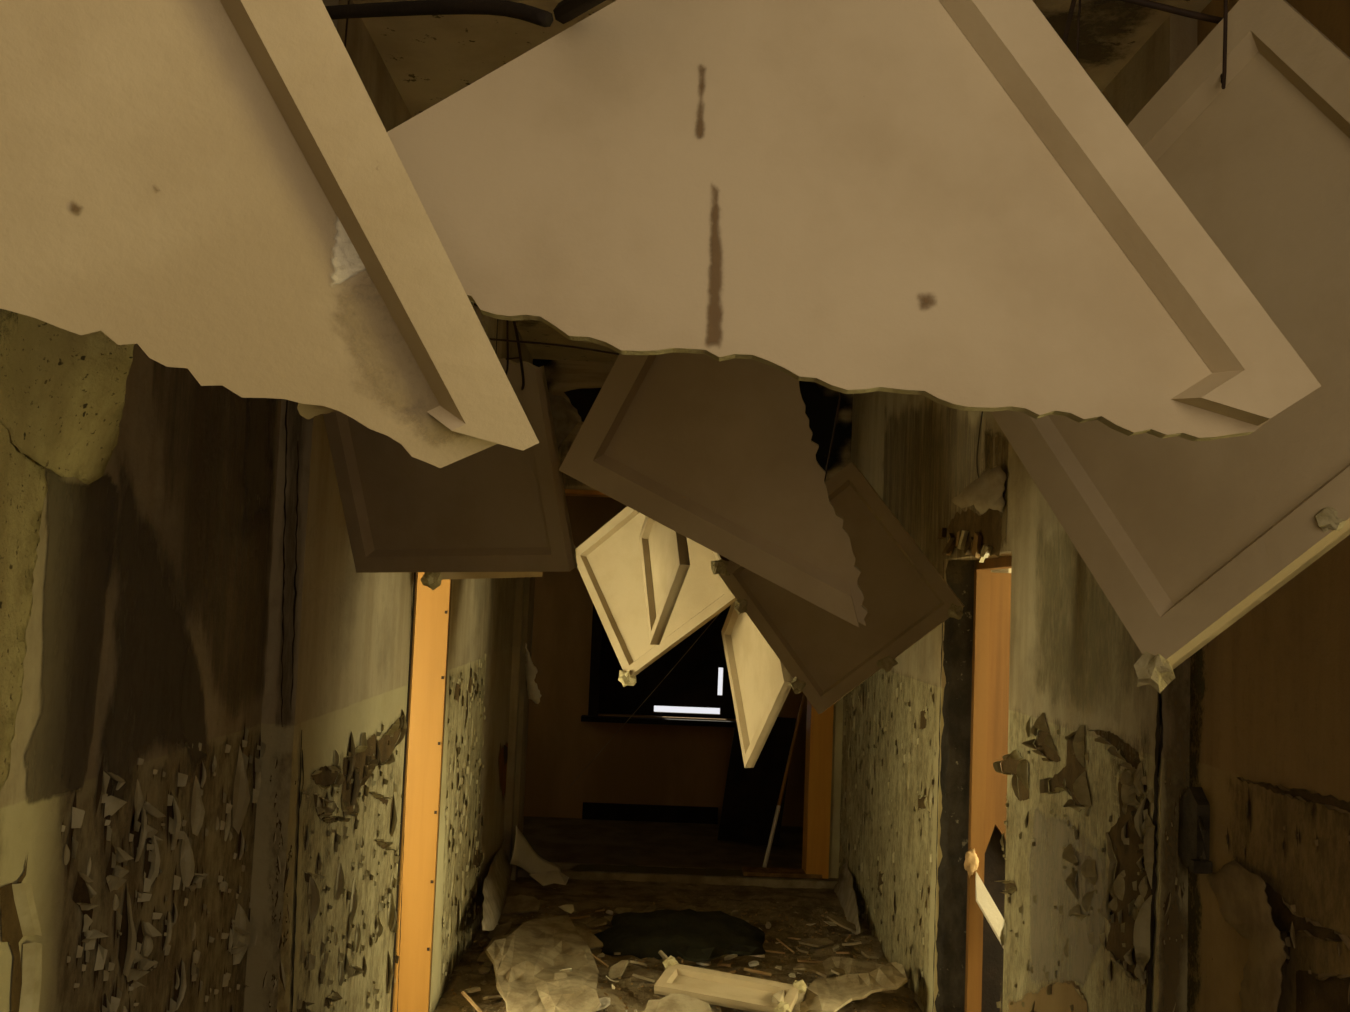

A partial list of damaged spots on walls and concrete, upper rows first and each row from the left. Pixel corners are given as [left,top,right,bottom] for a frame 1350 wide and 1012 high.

peeling [331,218,365,284]
peeling [12,883,42,1012]
peeling [61,710,407,1012]
peeling [442,654,512,987]
peeling [993,713,1155,1012]
peeling [1207,777,1350,1012]